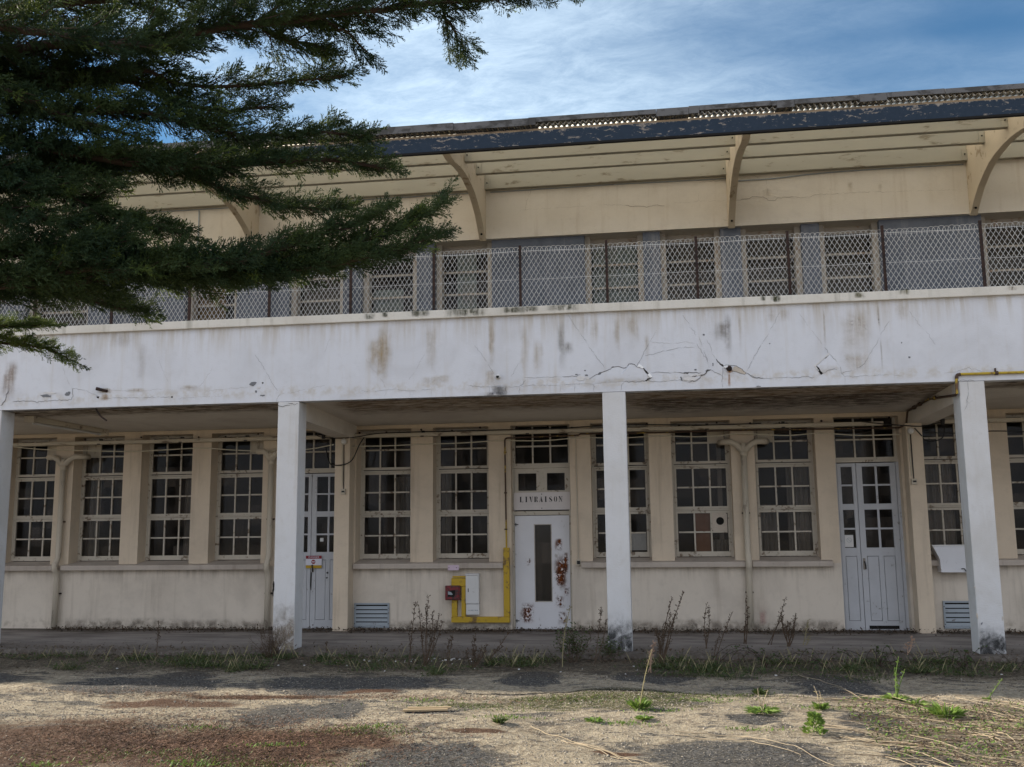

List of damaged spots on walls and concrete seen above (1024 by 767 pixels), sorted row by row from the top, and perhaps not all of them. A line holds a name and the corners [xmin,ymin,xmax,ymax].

crack [476,311,933,392]
corrosion [556,539,568,623]
damp [980,636,1006,654]